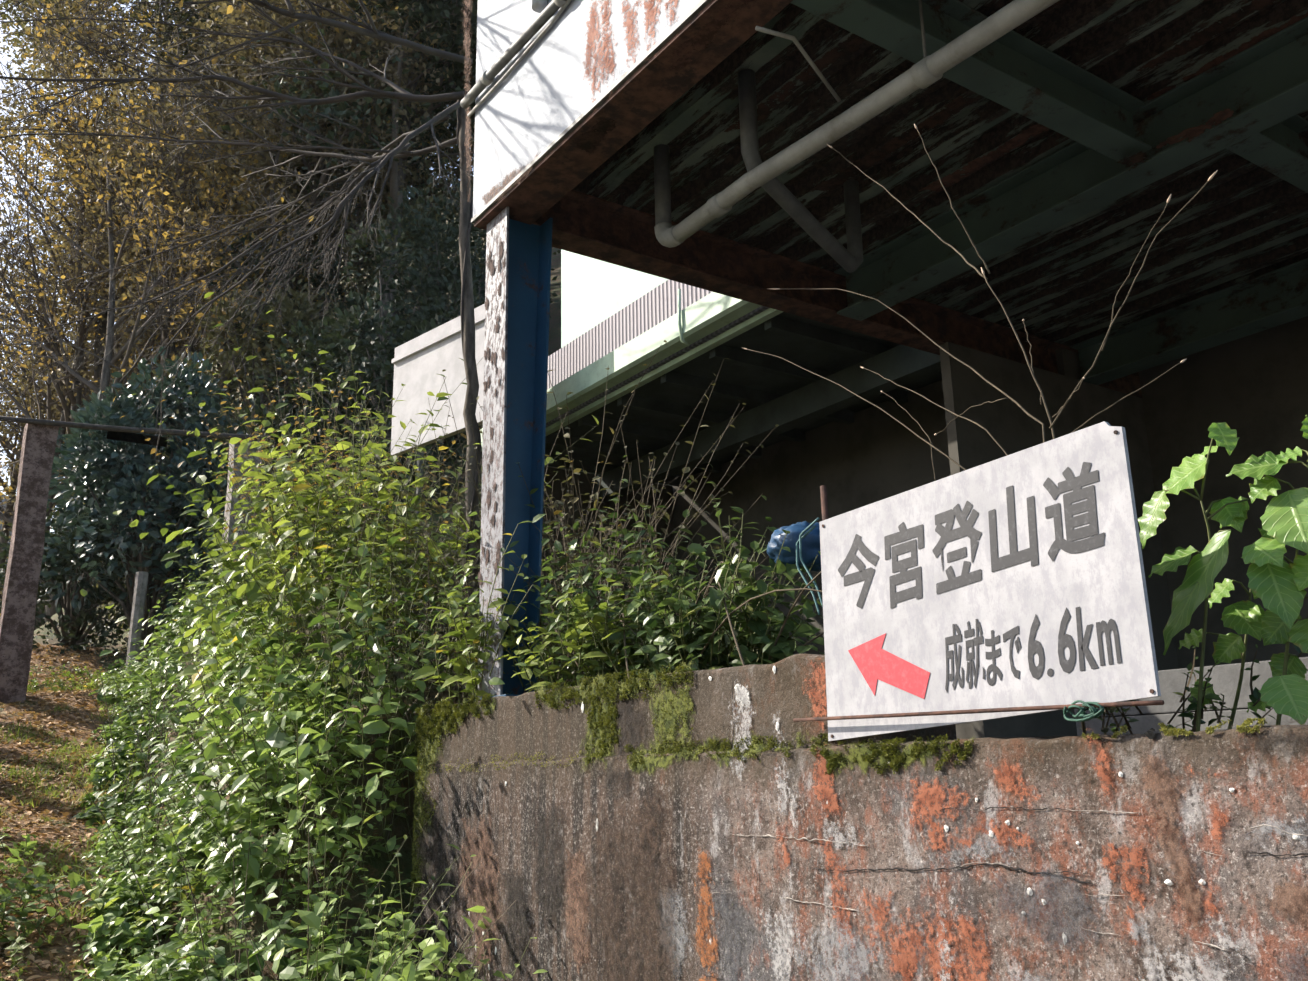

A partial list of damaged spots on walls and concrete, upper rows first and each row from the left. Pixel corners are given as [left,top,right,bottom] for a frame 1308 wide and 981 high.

rust [582,0,678,102]
rust [802,658,827,732]
water stain [502,685,691,981]
rust [812,747,843,818]
rust [904,778,1035,854]
rust [985,758,1041,806]
rust [1086,728,1121,796]
water stain [416,793,464,980]
rust [819,836,998,981]
crack [703,834,1126,911]
rust [1101,842,1149,945]
rust [1204,884,1219,917]